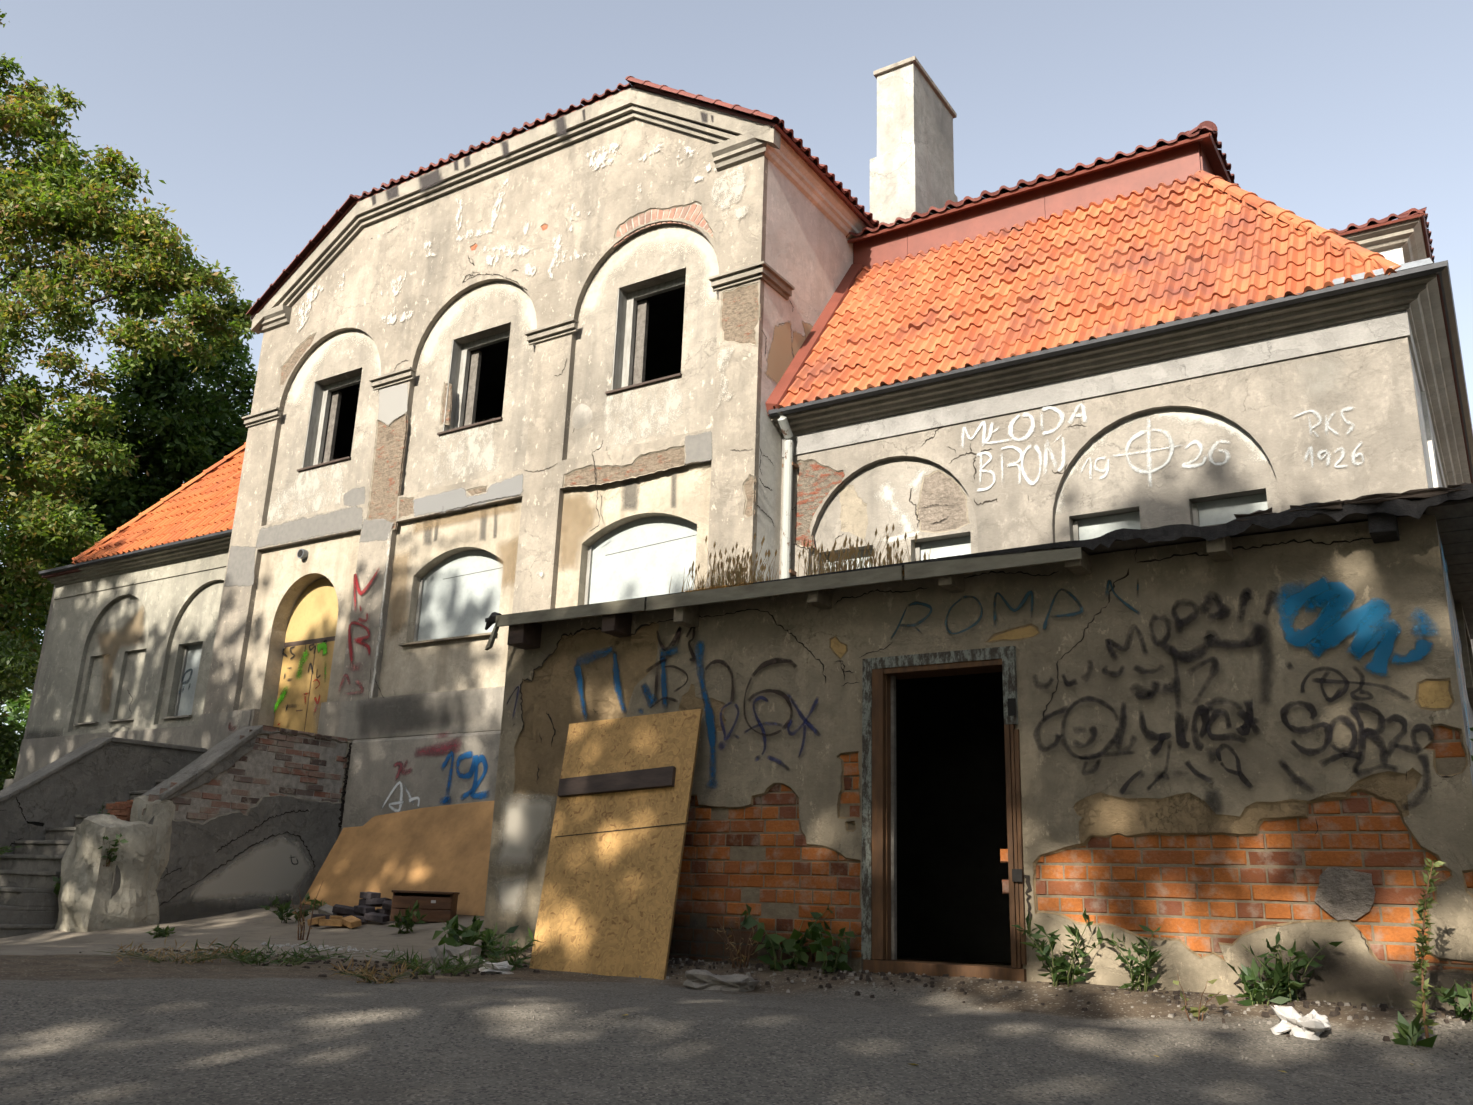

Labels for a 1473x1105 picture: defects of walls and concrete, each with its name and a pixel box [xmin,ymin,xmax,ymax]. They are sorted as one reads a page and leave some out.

spalling [793,459,868,549]
spalling [106,725,350,825]
crack [160,742,352,906]
crack [520,609,892,784]
spalling [674,783,861,960]
spalling [836,751,860,832]
spalling [1000,849,1009,894]
crack [1043,538,1372,717]
spalling [1032,678,1473,972]